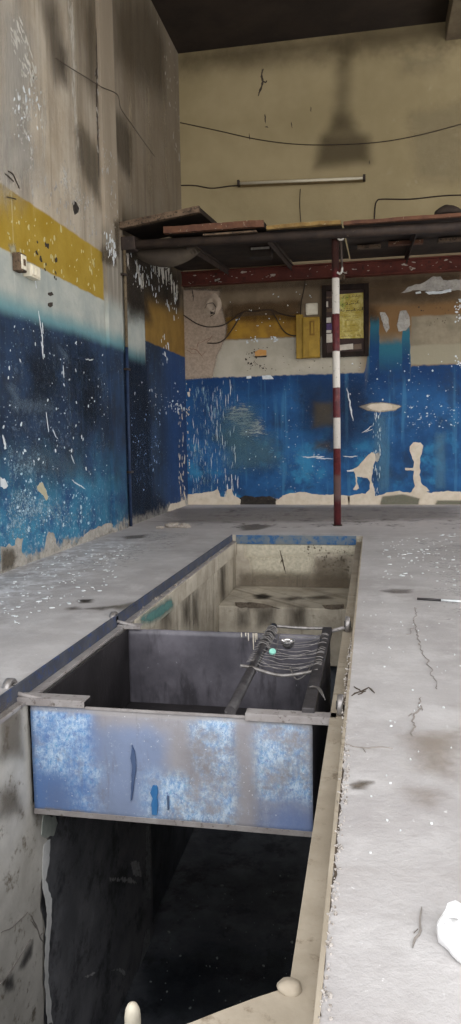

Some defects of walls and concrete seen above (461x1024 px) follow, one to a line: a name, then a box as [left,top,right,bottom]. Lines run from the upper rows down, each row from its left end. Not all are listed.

water stain [67,0,81,206]
crack [258,69,267,96]
peeling [104,230,461,511]
spalling [0,424,113,574]
crack [329,607,437,911]